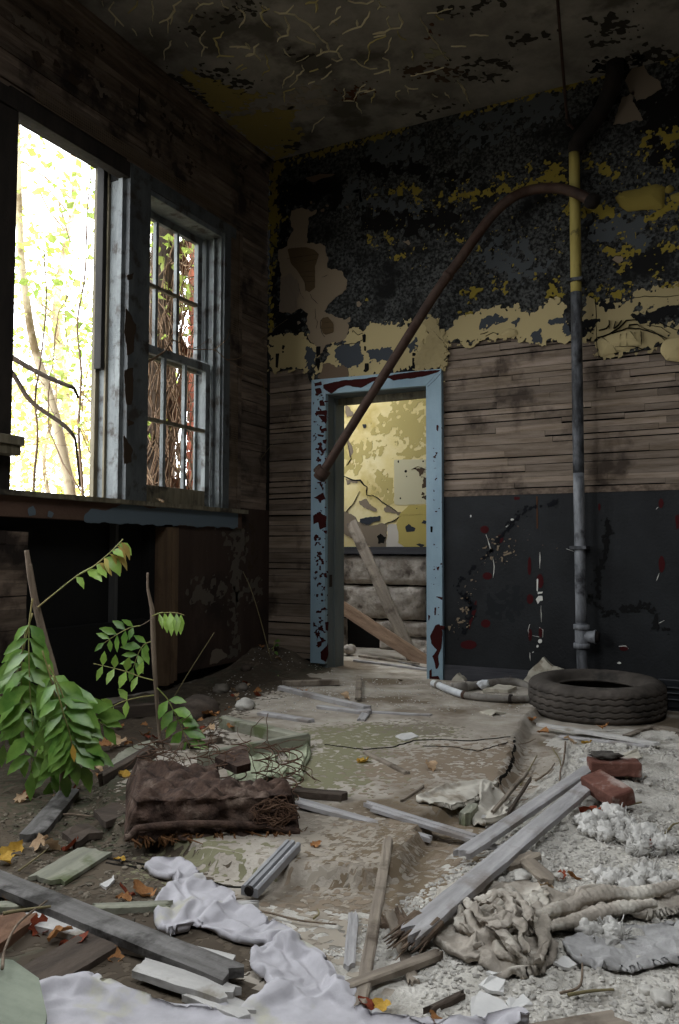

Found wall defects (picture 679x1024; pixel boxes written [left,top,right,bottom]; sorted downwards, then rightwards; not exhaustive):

spalling [613,65,679,174]
spalling [267,152,679,453]
peeling [313,484,327,538]
peeling [344,499,426,547]
peeling [317,622,329,662]
peeling [428,499,562,680]